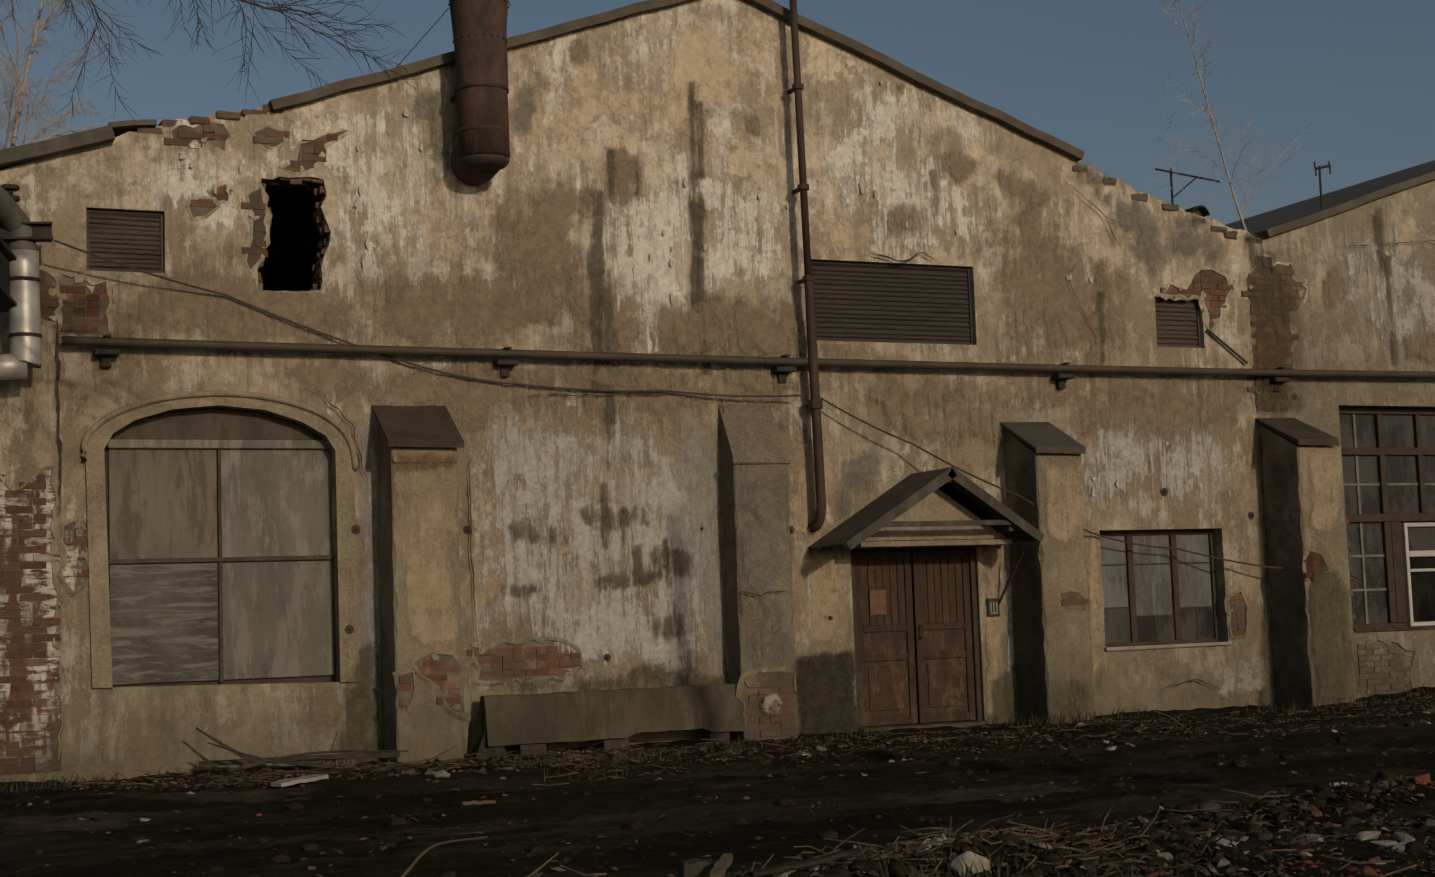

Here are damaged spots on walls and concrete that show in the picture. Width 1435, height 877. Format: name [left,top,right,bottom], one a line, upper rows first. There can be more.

flaking render [39,264,116,338]
peeling [142,104,461,292]
damp [108,82,845,442]
flaking render [1157,253,1308,417]
flaking render [0,461,89,778]
peeling [392,400,721,722]
flaking render [736,666,799,739]
flaking render [1302,548,1329,587]
flaking render [1310,455,1354,596]
flaking render [1353,636,1417,699]